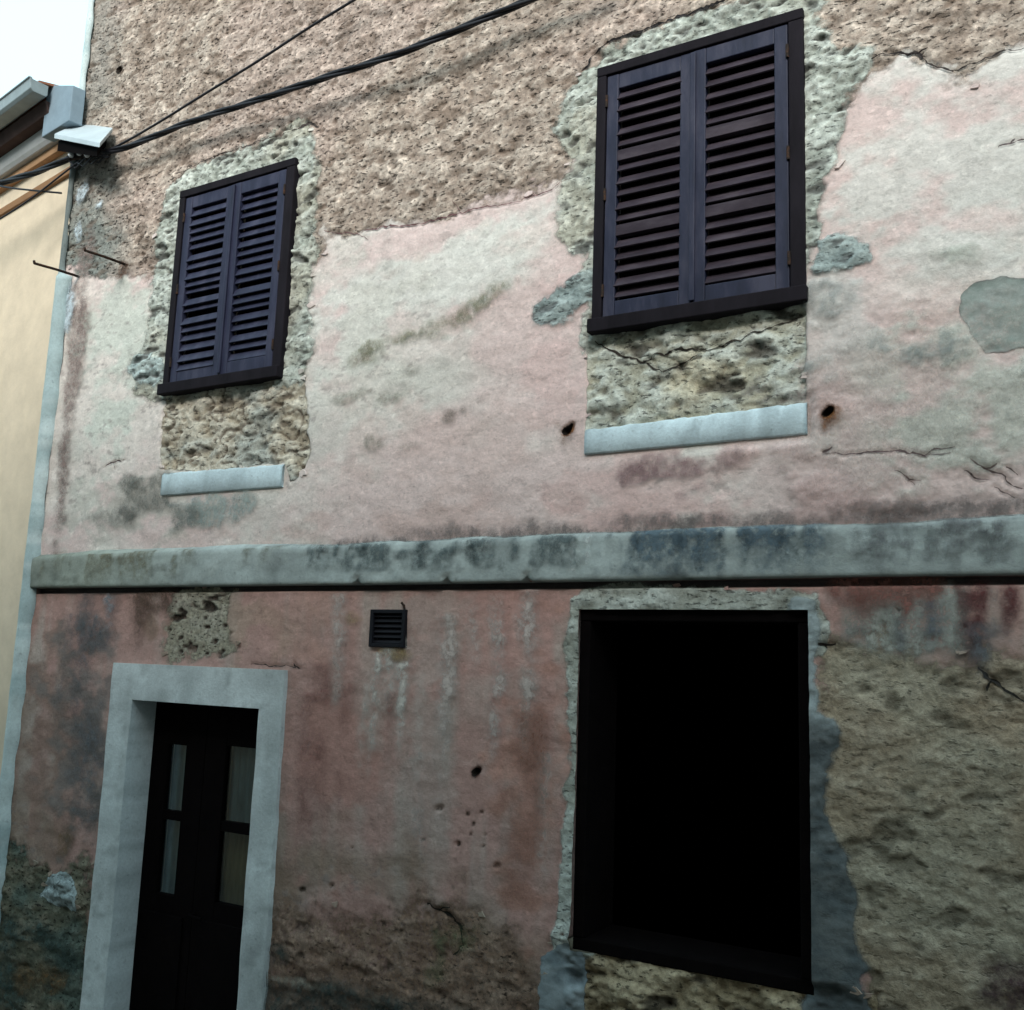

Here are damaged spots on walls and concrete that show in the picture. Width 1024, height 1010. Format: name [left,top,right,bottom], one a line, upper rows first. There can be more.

crack [871,47,1024,72]
water stain [58,285,90,521]
flaking render [159,368,311,481]
flaking render [583,304,808,431]
crack [595,316,802,373]
crack [823,446,1023,498]
water stain [309,521,593,571]
water stain [606,498,1024,569]
water stain [371,647,408,725]
crack [978,667,1024,702]
flaking render [815,576,1024,1010]
flaking render [584,953,814,1010]